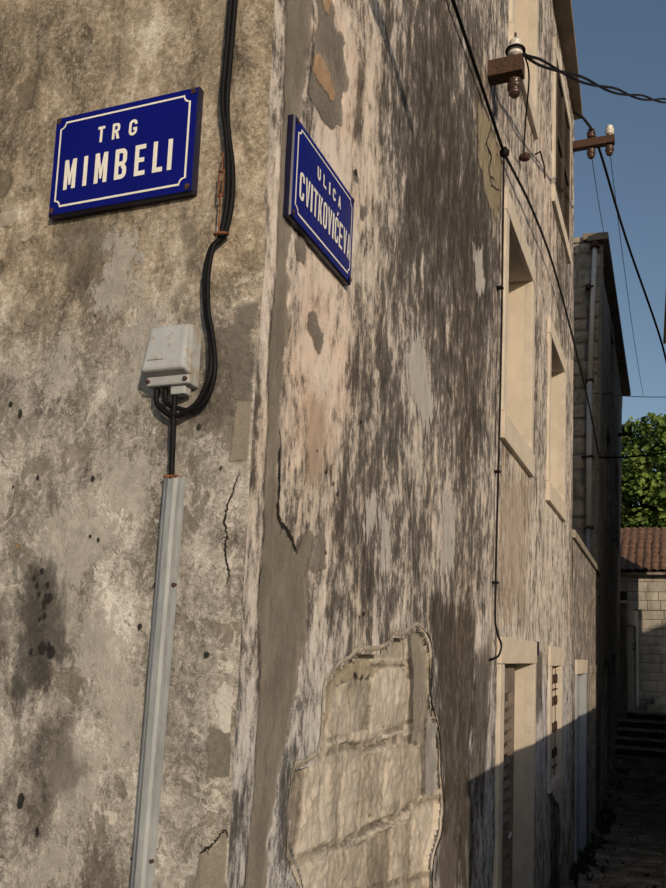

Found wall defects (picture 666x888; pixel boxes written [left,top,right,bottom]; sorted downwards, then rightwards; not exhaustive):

damp [26,322,85,426]
damp [80,220,167,417]
damp [401,328,435,435]
damp [472,244,486,302]
damp [0,463,18,526]
crack [217,470,240,585]
crack [276,431,301,554]
peeling [245,0,349,888]
damp [360,485,397,582]
damp [437,490,457,578]
damp [10,424,168,888]
spalling [286,622,443,888]